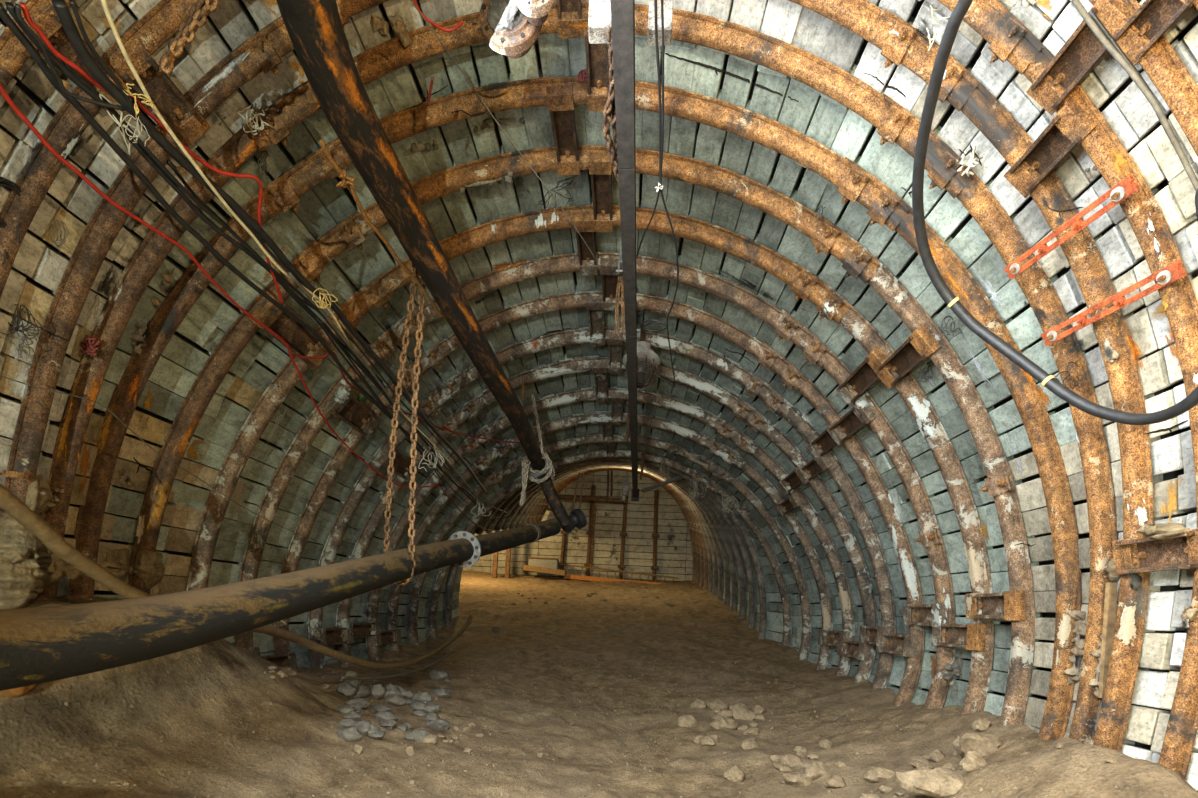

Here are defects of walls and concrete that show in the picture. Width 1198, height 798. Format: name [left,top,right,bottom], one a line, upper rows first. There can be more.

rust [316,0,333,41]
rust [325,56,365,110]
rust [379,138,425,227]
rust [429,244,447,273]
rust [914,233,969,301]
rust [457,301,479,333]
rust [1129,335,1145,368]
rust [1154,298,1180,365]
rust [1021,369,1051,409]
rust [48,378,115,491]
rust [146,485,174,531]
rust [1161,477,1181,524]